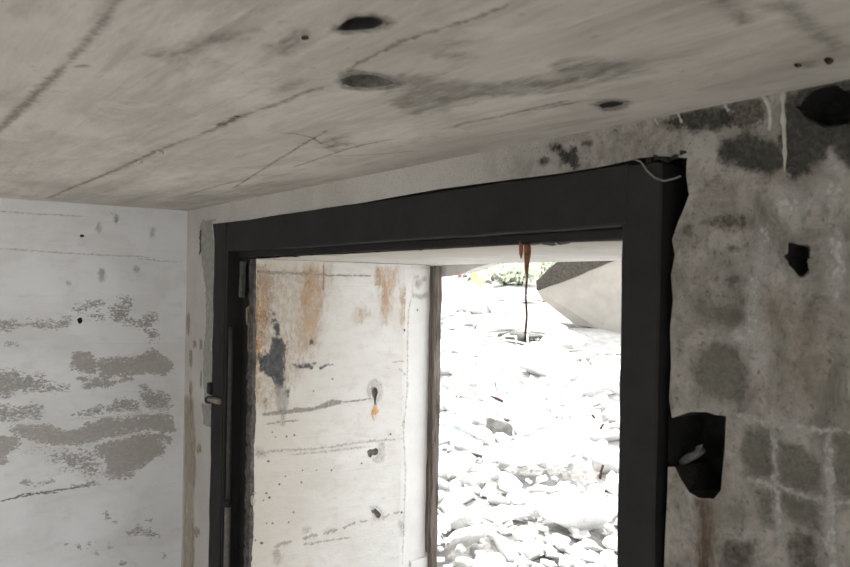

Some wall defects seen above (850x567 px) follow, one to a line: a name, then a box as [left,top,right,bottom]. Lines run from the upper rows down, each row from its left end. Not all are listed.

spalling [336,15,390,33]
spalling [339,70,400,90]
spalling [799,85,850,128]
leakage [540,142,592,170]
leakage [663,80,850,203]
spalling [784,238,814,279]
rust [255,266,275,393]
leakage [257,311,333,398]
peeling [0,294,178,488]